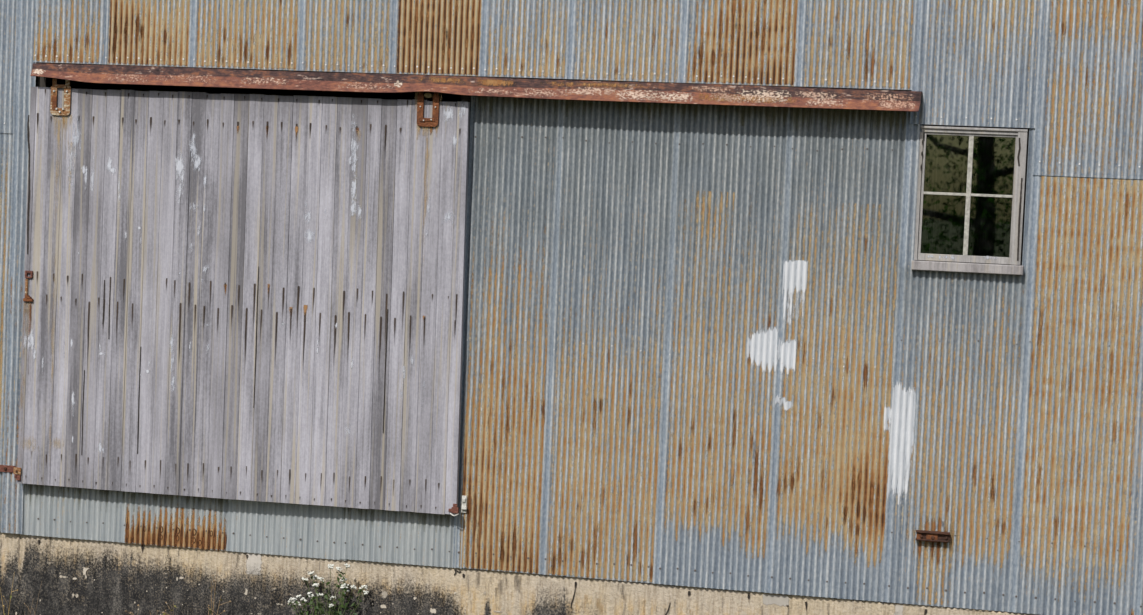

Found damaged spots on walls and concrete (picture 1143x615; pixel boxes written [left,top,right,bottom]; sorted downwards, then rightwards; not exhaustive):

rust [33,0,913,105]
rust [0,210,31,486]
rust [459,191,898,589]
rust [906,0,1143,615]
rust [125,506,227,552]
damp [0,536,465,615]
damp [532,592,576,615]